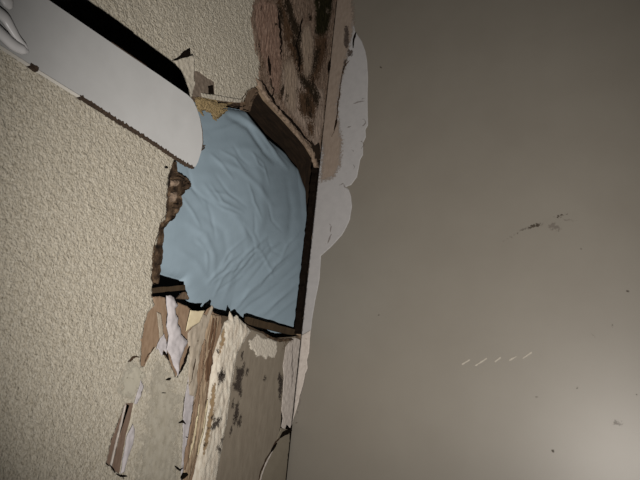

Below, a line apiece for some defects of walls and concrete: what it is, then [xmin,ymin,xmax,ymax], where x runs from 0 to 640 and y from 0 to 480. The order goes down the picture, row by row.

damp [270,0,334,145]
spalling [151,162,191,284]
flaking render [216,22,368,480]
damp [203,367,225,455]
mould [217,351,249,454]
crack [259,428,292,480]